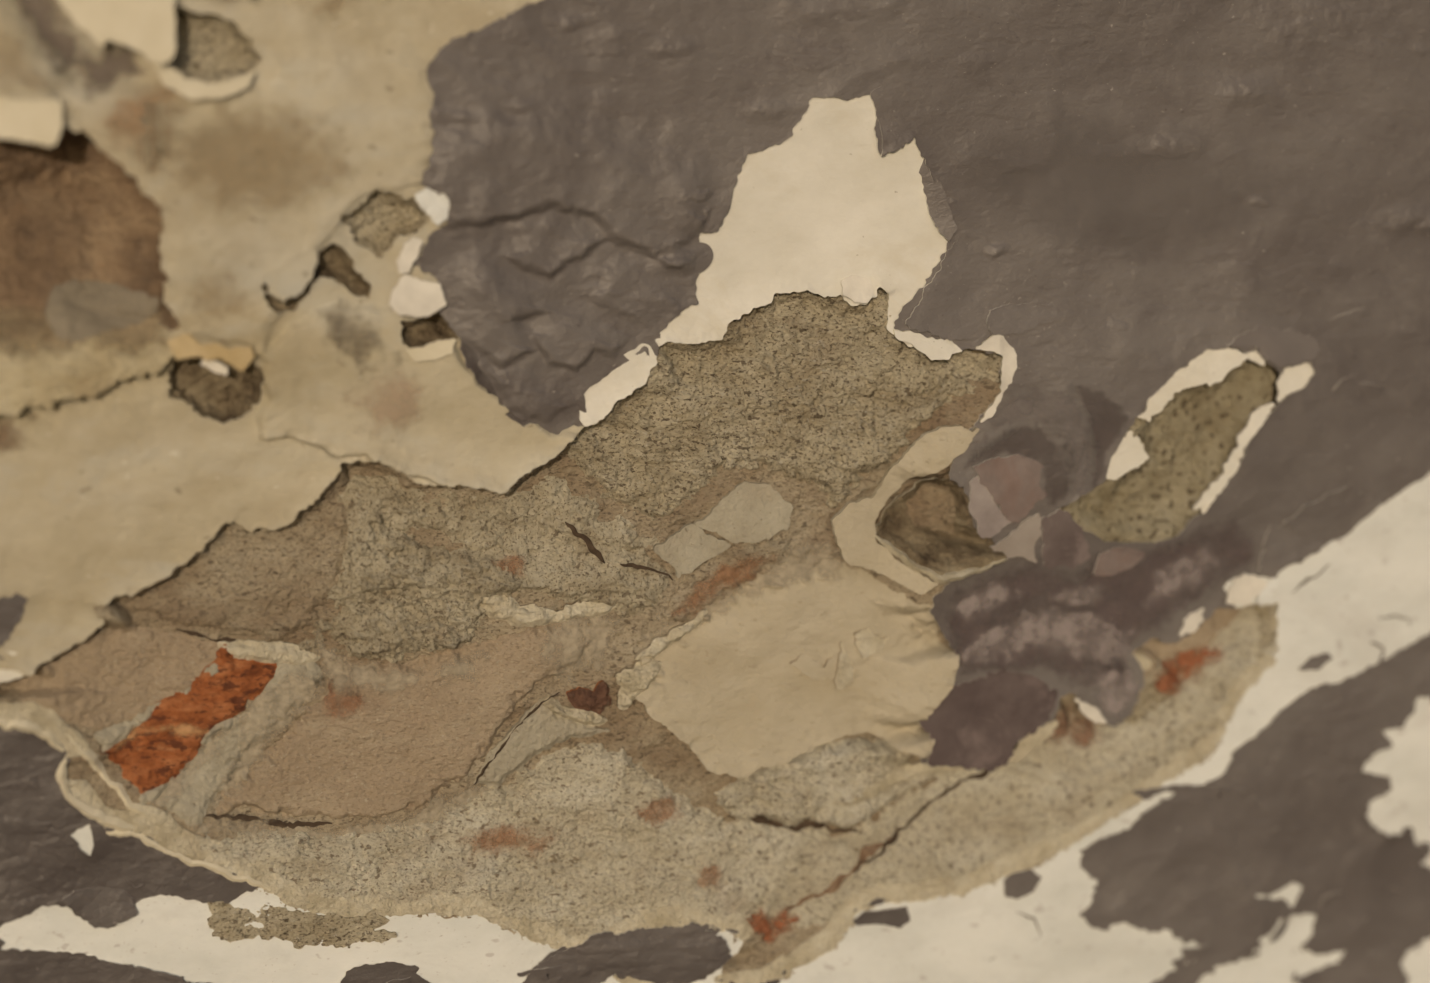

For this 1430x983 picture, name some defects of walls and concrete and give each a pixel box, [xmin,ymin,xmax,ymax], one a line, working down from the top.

flaking render [0,0,584,683]
peeling [655,86,962,360]
flaking render [0,287,1314,983]
crack [726,746,1015,914]
peeling [1161,474,1430,787]
peeling [1362,696,1430,867]